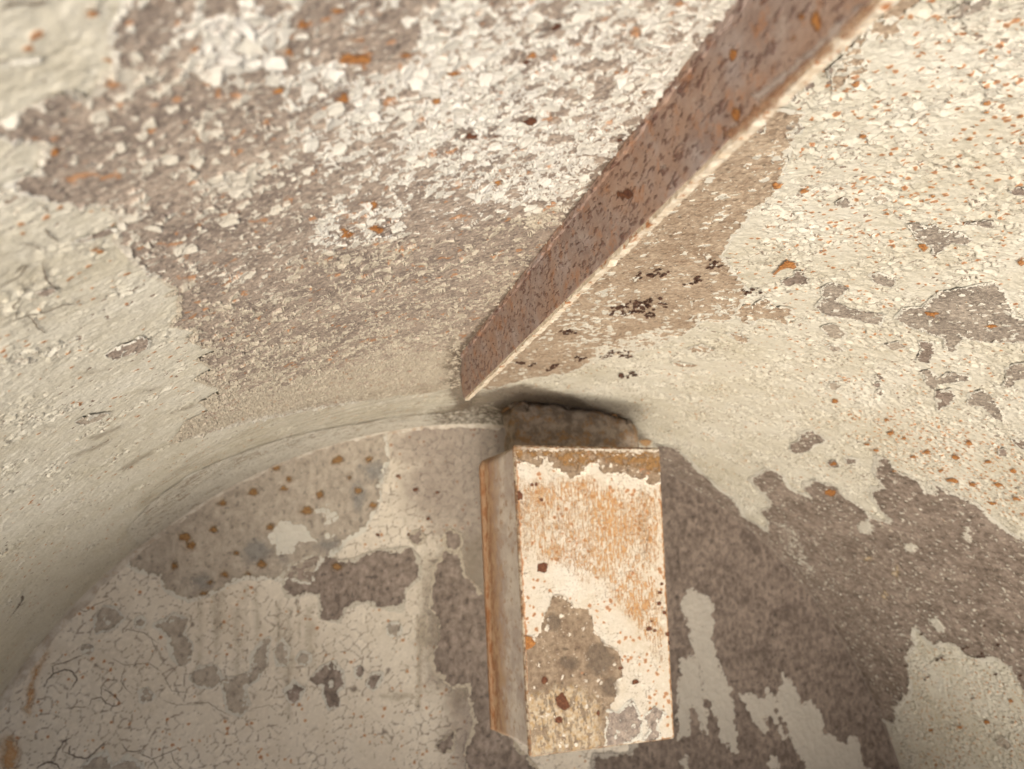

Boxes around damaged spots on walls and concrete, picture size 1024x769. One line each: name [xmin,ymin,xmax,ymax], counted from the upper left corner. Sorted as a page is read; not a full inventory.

corrosion [727,1,878,139]
peeling [0,0,736,445]
corrosion [617,188,633,200]
corrosion [773,260,796,275]
corrosion [437,346,622,425]
peeling [781,271,1024,423]
corrosion [301,491,323,515]
corrosion [516,435,670,647]
peeling [80,403,1024,769]
crack [44,628,276,715]
crack [36,737,186,769]
corrosion [528,677,604,756]